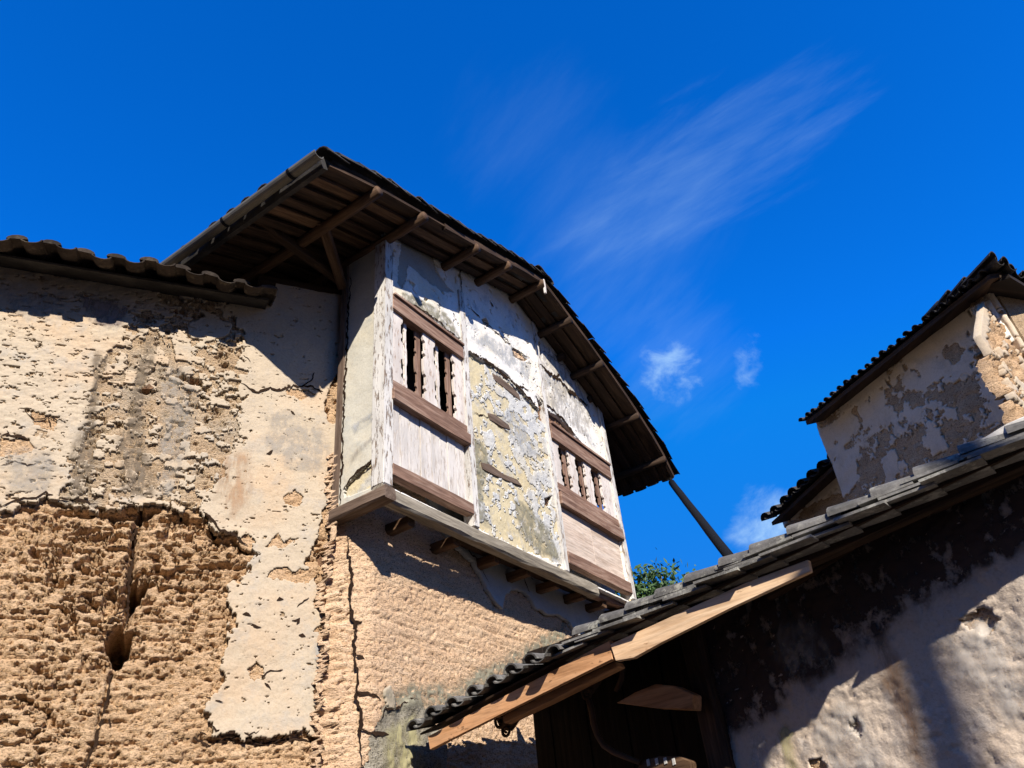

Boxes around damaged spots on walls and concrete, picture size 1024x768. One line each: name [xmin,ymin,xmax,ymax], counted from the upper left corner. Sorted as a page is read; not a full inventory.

crack [108,512,141,629]
spalling [0,273,338,768]
crack [240,352,332,396]
peeling [346,463,372,496]
crack [346,535,419,768]
peeling [393,243,469,302]
peeling [468,331,567,568]
spalling [786,297,1024,526]